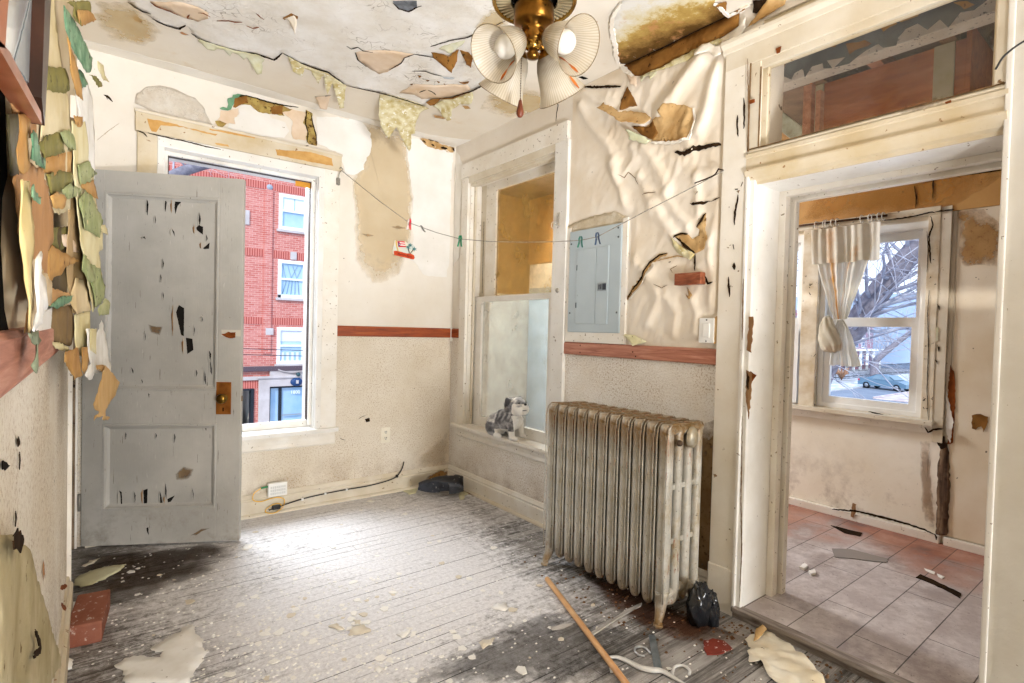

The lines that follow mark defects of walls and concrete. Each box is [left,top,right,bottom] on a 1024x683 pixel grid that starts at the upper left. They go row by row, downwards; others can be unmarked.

crack [128,2,481,106]
peeling [128,0,514,166]
spalling [0,90,9,331]
peeling [935,327,955,444]
spalling [971,414,988,432]